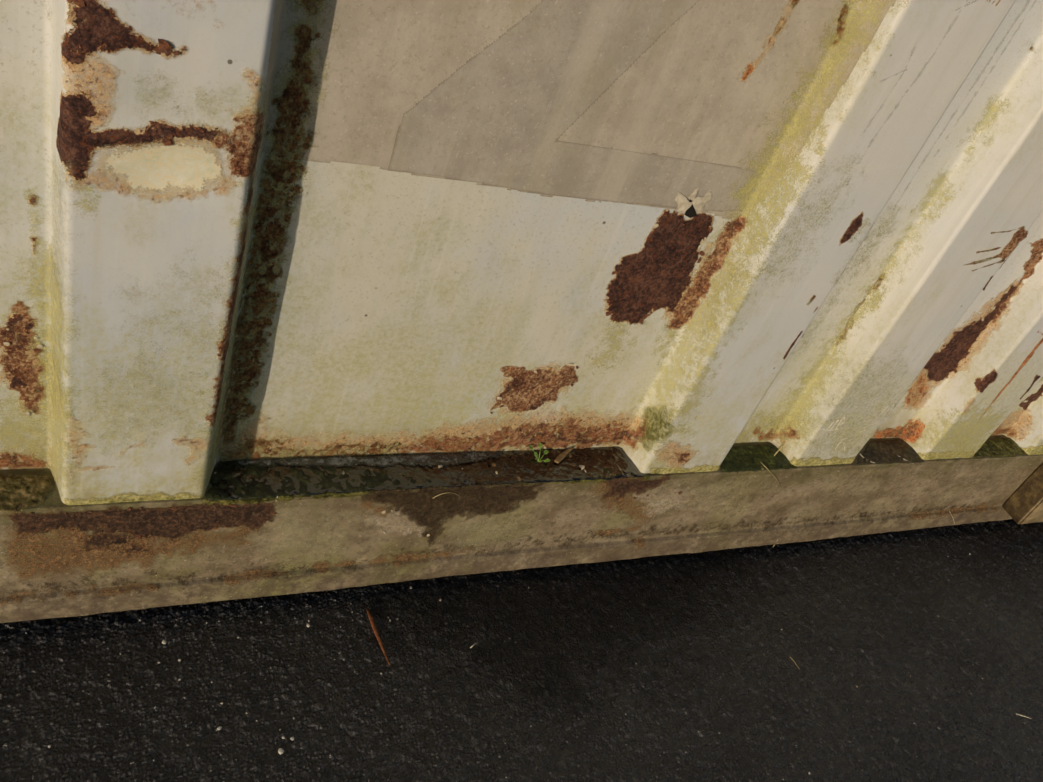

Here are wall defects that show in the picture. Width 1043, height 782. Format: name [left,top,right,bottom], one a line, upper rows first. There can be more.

corrosion [742,0,799,81]
corrosion [0,301,103,473]
corrosion [56,0,650,465]
corrosion [592,188,747,375]
corrosion [736,414,805,444]
corrosion [840,212,868,245]
corrosion [836,274,885,345]
corrosion [874,239,1043,443]
damp [361,482,542,544]
corrosion [211,441,996,585]